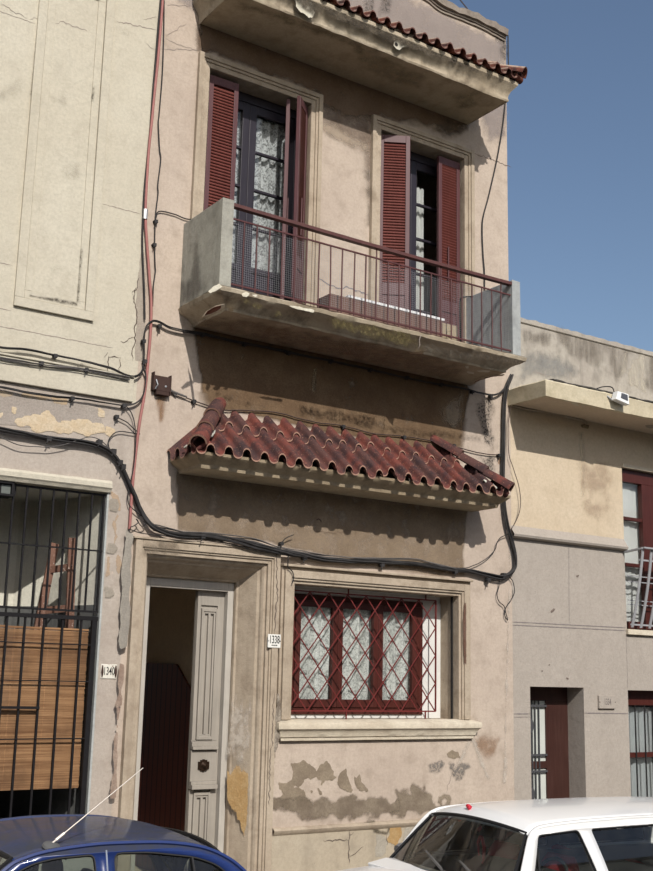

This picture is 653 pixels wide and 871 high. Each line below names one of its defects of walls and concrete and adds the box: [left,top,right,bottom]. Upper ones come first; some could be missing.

damp [296,0,487,74]
crack [106,278,139,371]
peeling [0,390,115,437]
mould [478,400,494,444]
peeling [227,707,250,833]